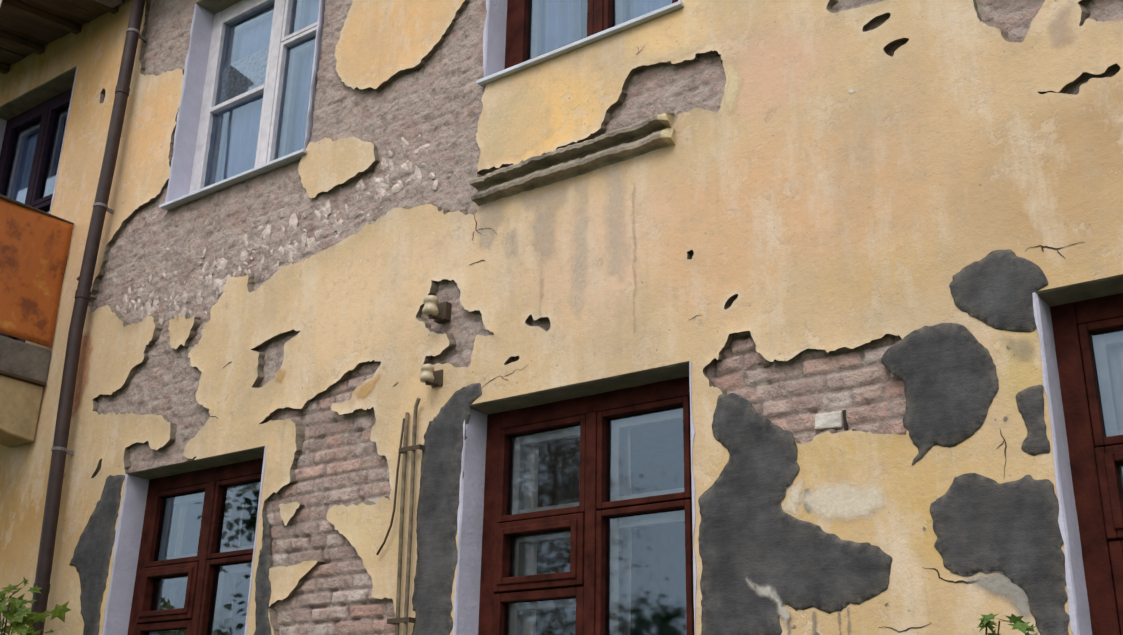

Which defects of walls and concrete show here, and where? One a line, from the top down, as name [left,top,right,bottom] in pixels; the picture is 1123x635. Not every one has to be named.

flaking render [973,0,1045,43]
flaking render [542,50,726,155]
flaking render [1038,63,1121,95]
flaking render [88,0,523,474]
crack [1029,242,1085,259]
flaking render [703,331,907,444]
flaking render [259,360,395,635]
crack [924,568,976,584]